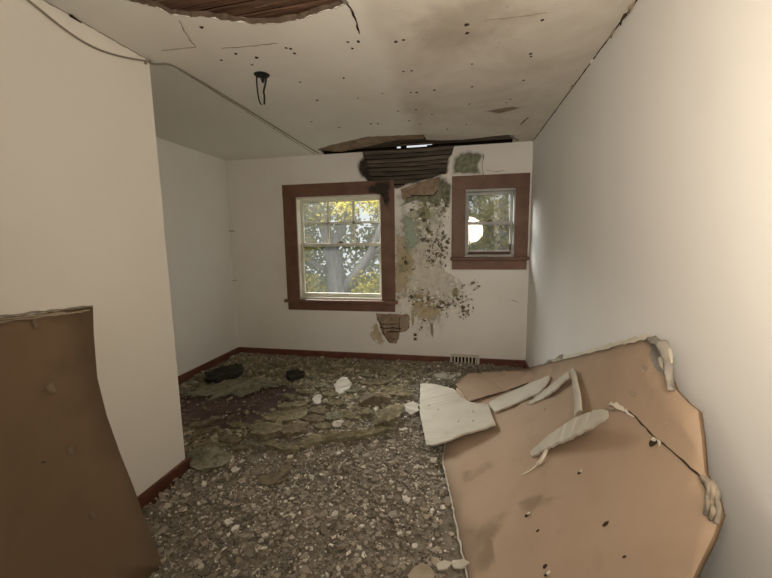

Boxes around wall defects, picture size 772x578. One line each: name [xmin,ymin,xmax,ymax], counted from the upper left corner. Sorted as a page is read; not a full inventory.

flaking render [126,0,343,25]
crack [346,4,360,34]
leakage [454,153,484,173]
peeling [349,146,480,344]